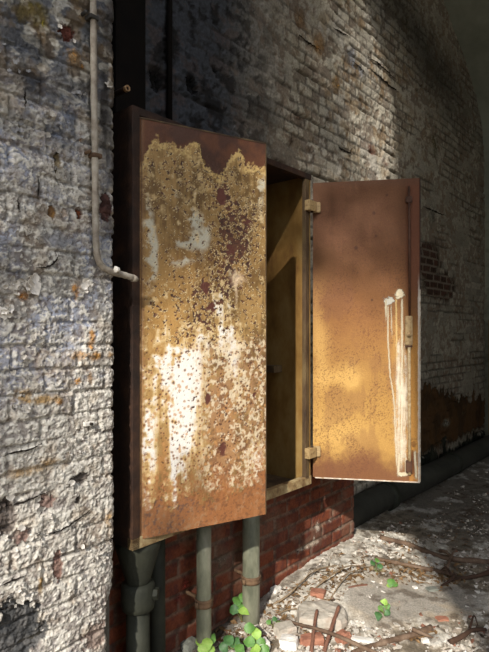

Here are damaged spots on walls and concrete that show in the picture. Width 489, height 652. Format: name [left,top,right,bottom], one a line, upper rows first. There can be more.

crack [353,56,396,90]
peeling [421,242,456,305]
flaking render [421,381,485,455]
spalling [0,583,49,652]